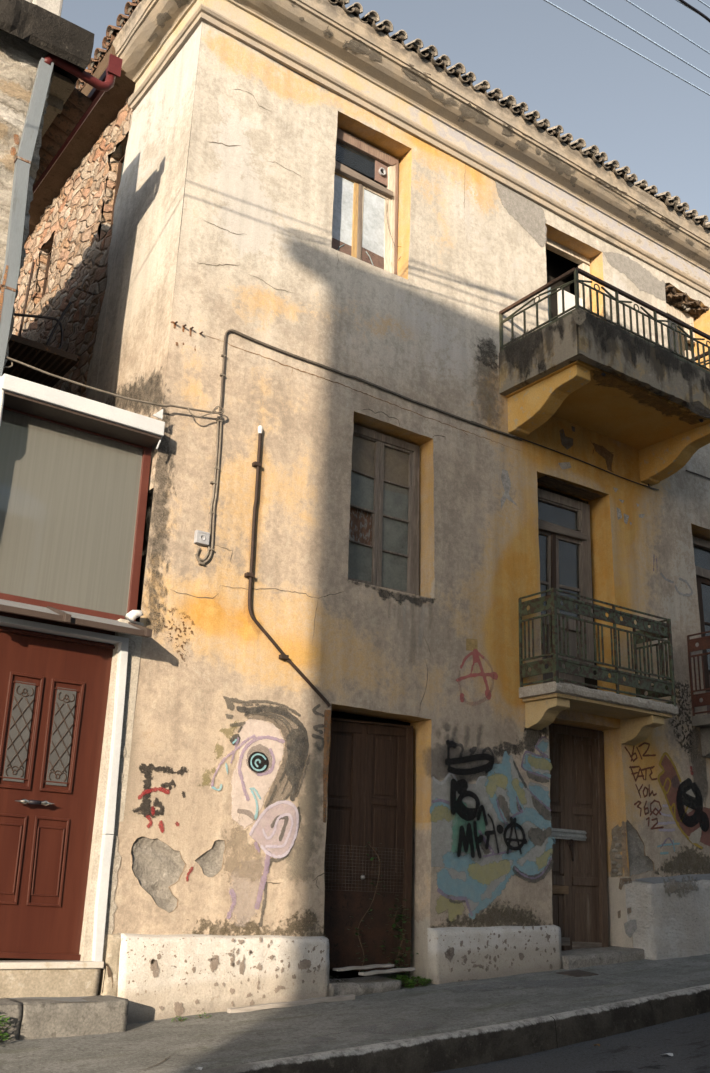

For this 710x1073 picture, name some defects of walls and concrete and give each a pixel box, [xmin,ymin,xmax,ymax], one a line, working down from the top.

flaking render [401,64,490,126]
flaking render [494,123,710,249]
damp [477,322,563,424]
damp [587,308,710,392]
damp [593,370,705,425]
damp [106,367,176,632]
crack [170,545,341,641]
spalling [131,837,226,913]
spalling [609,820,655,890]